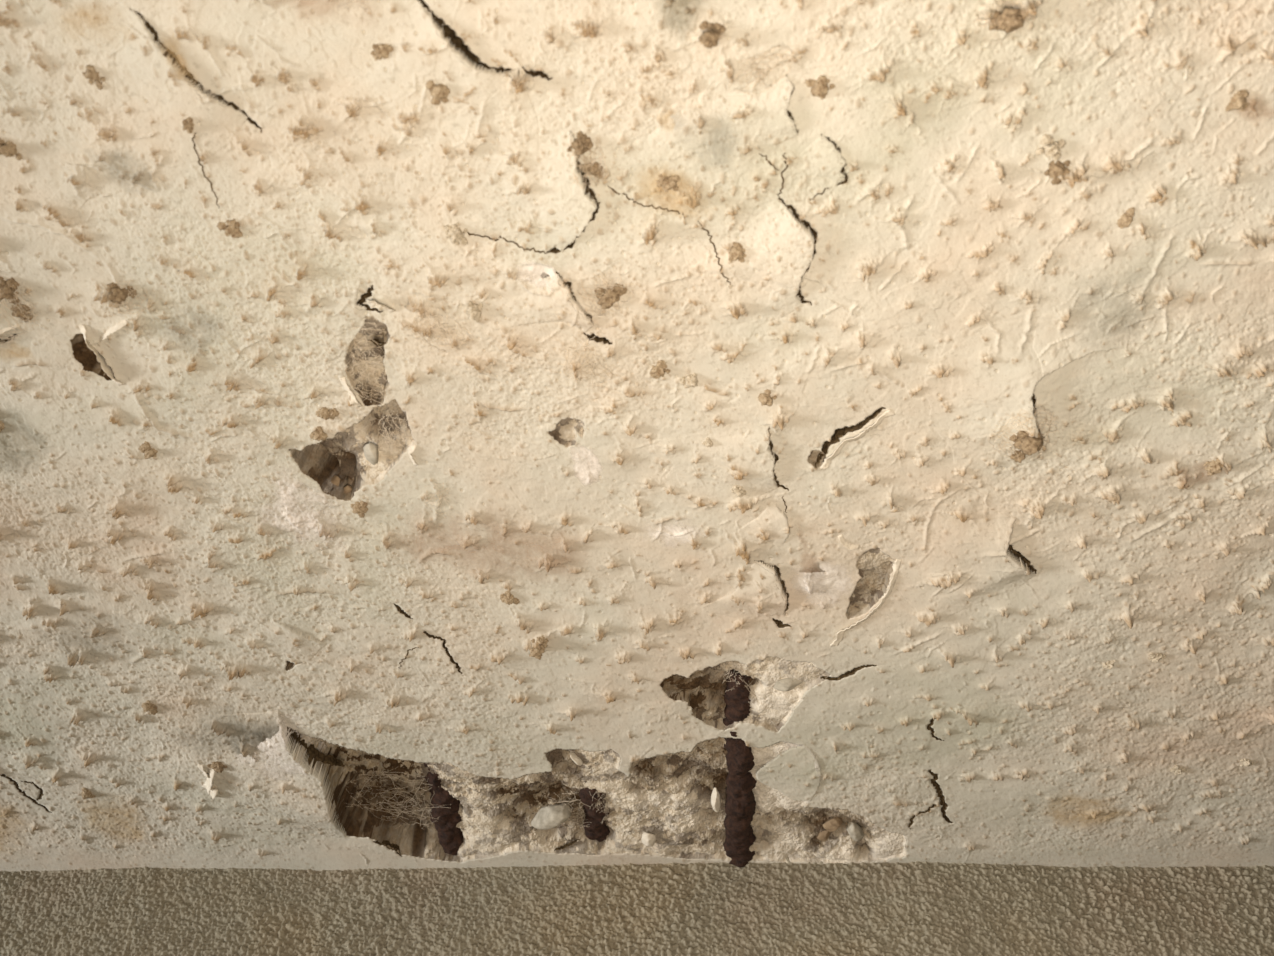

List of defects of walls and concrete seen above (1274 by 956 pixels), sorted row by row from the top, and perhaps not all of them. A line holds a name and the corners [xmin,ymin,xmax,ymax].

crack [130,9,262,133]
crack [418,0,553,82]
spalling [70,319,128,386]
spalling [289,300,418,501]
peeling [807,409,895,470]
spalling [830,534,902,647]
crack [1,774,52,813]
spalling [287,657,907,868]